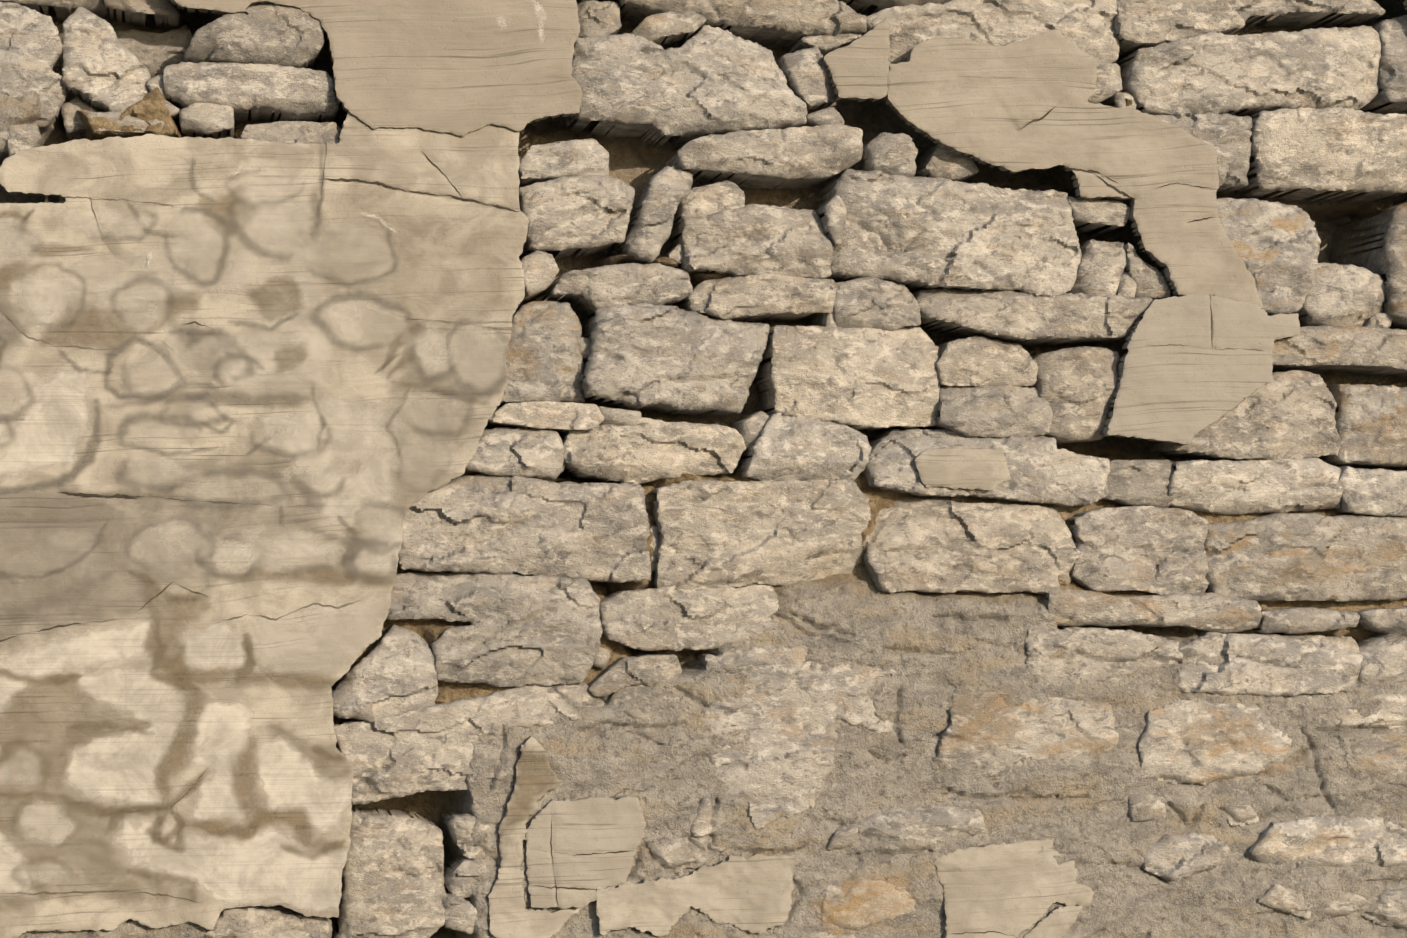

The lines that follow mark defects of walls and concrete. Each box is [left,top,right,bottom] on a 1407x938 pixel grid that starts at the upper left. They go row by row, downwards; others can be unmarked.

crack [60,196,193,257]
crack [315,142,519,239]
peeling [823,18,1300,445]
crack [0,309,118,350]
crack [358,306,510,331]
crack [59,492,272,506]
peeling [0,0,583,938]
peeling [913,446,1011,491]
crack [0,582,360,686]
damp [0,599,352,911]
peeling [487,736,796,938]
peeling [932,839,1096,938]